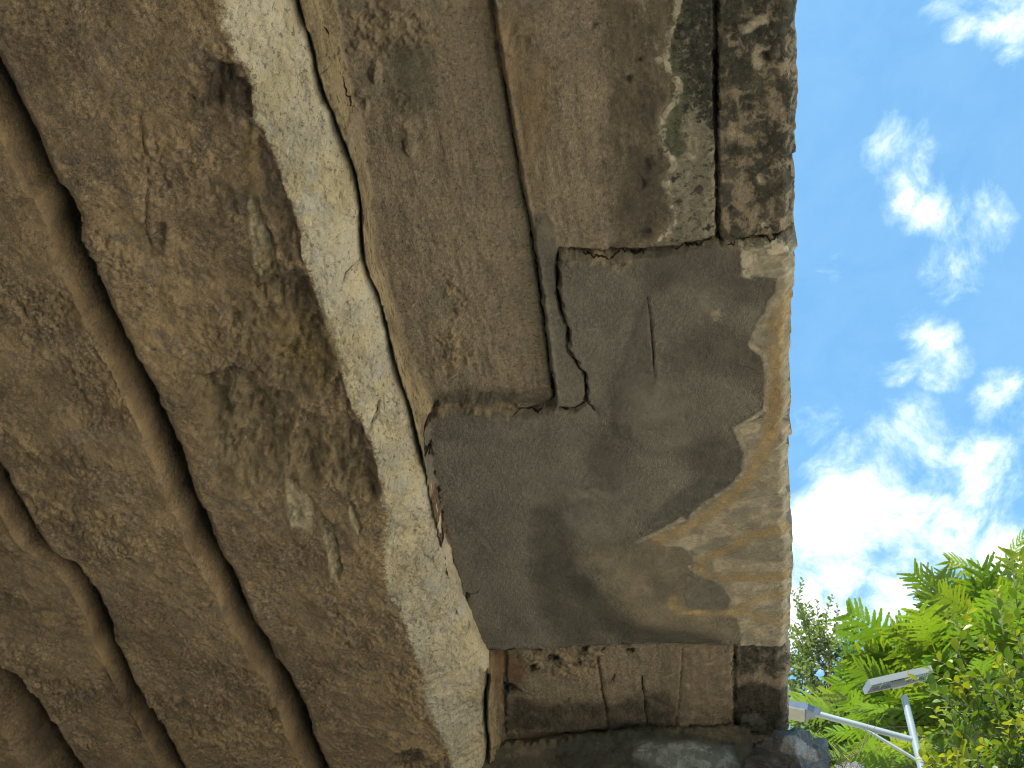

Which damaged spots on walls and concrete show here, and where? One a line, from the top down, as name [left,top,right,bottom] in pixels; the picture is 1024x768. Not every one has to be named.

crack [492,0,646,417]
crack [647,297,655,373]
water stain [505,0,798,768]